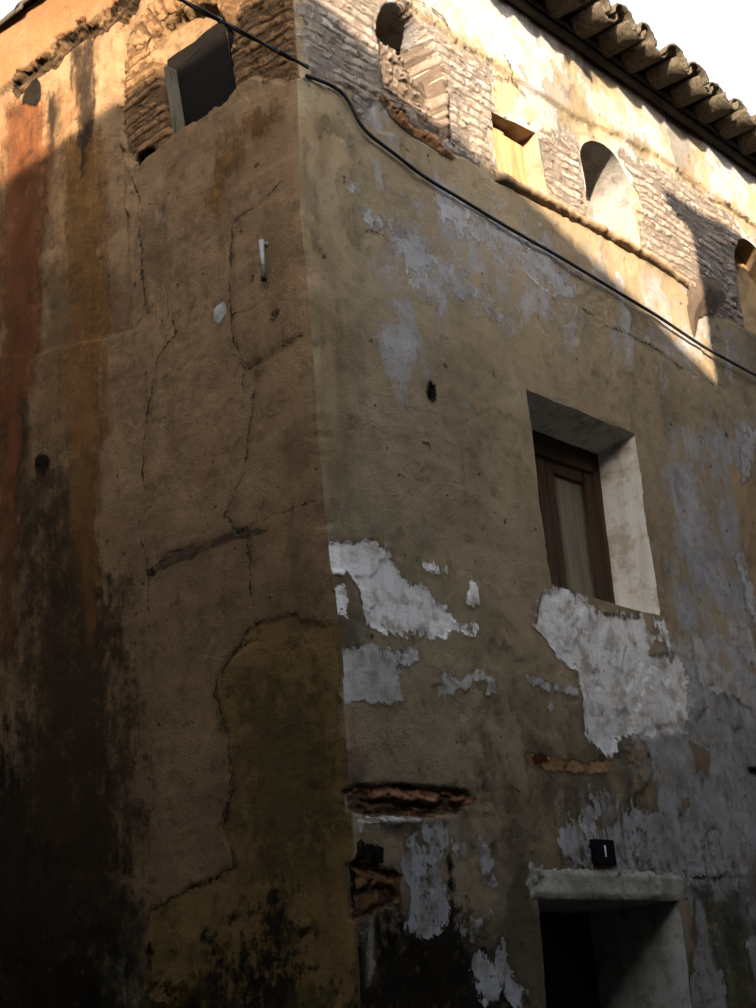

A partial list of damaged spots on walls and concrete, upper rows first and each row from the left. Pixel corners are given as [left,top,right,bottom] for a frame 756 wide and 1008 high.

leakage [70,36,97,177]
flaking render [12,0,498,172]
leakage [0,91,153,1008]
crack [131,176,315,931]
flaking render [105,538,529,1008]
flaking render [523,549,756,1008]
leakage [702,892,754,1008]